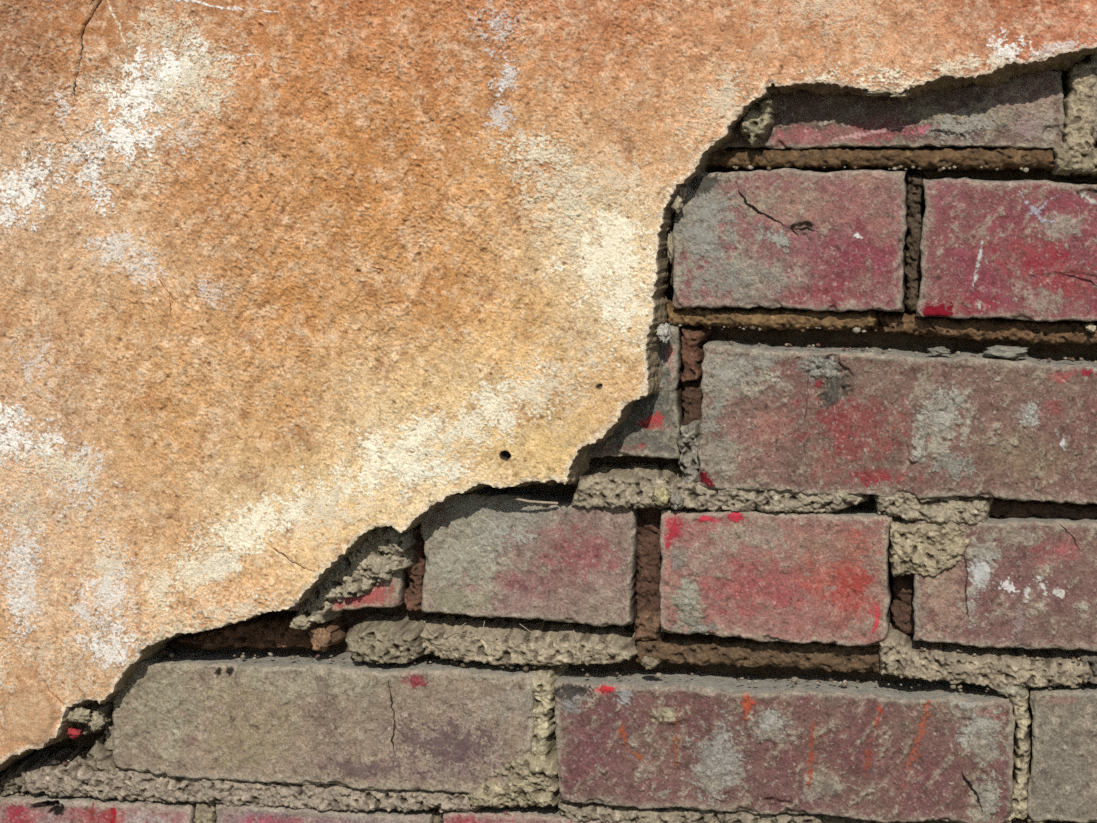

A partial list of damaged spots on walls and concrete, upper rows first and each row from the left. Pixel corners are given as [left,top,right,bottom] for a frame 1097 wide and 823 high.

crack [73,0,102,98]
peeling [0,2,255,236]
spalling [402,47,1097,611]
spalling [0,422,392,771]
peeling [663,543,718,635]
spalling [410,674,428,689]
spalling [554,684,637,714]
spalling [42,800,64,815]
peeling [650,704,793,811]
spalling [952,699,1011,823]